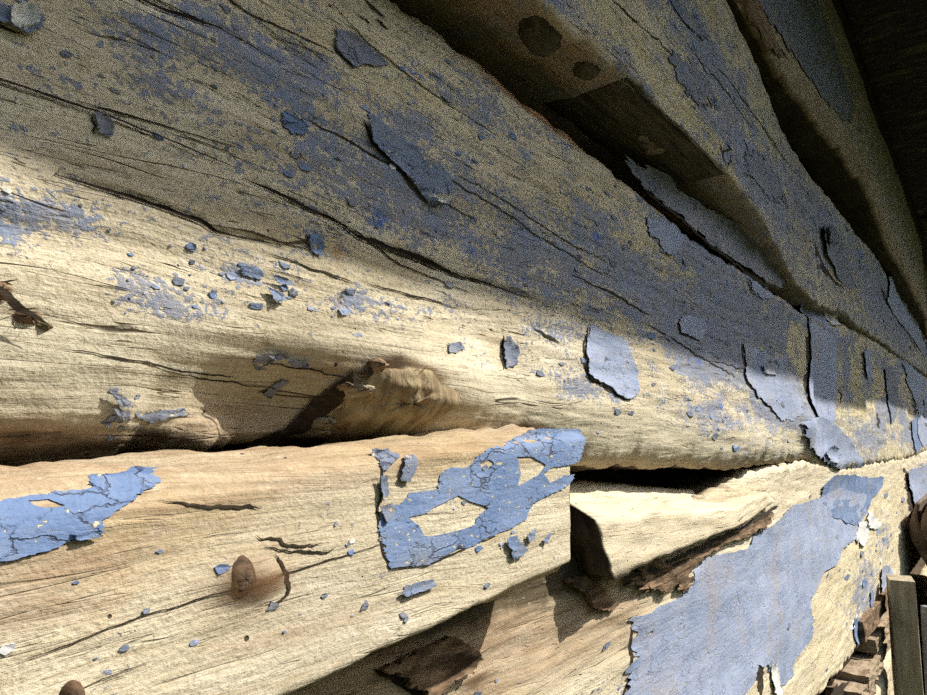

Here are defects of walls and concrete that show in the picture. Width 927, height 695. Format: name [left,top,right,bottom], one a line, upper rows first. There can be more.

peeling [0,0,46,36]
peeling [735,0,854,123]
peeling [359,105,458,213]
peeling [172,242,207,290]
peeling [624,154,789,299]
peeling [815,208,927,357]
peeling [580,324,640,415]
peeling [371,428,586,570]
peeling [617,296,927,695]
peeling [214,564,231,575]
peeling [402,579,437,597]
peeling [0,643,15,655]